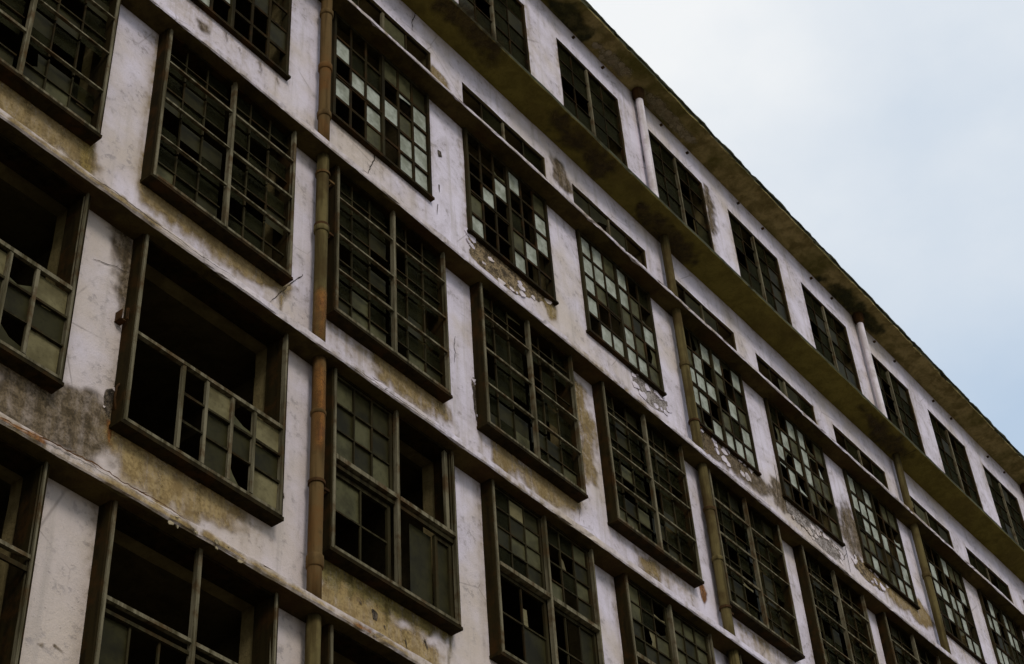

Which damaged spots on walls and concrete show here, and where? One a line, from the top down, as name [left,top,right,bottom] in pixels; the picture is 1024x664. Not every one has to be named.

spalling [464,227,552,305]
damp [637,203,698,264]
damp [703,184,717,235]
rust [317,291,327,332]
rust [316,368,325,445]
damp [574,379,597,486]
spalling [631,370,672,416]
peeling [700,429,754,481]
damp [98,426,304,594]
peeling [786,500,889,592]
damp [317,574,453,664]